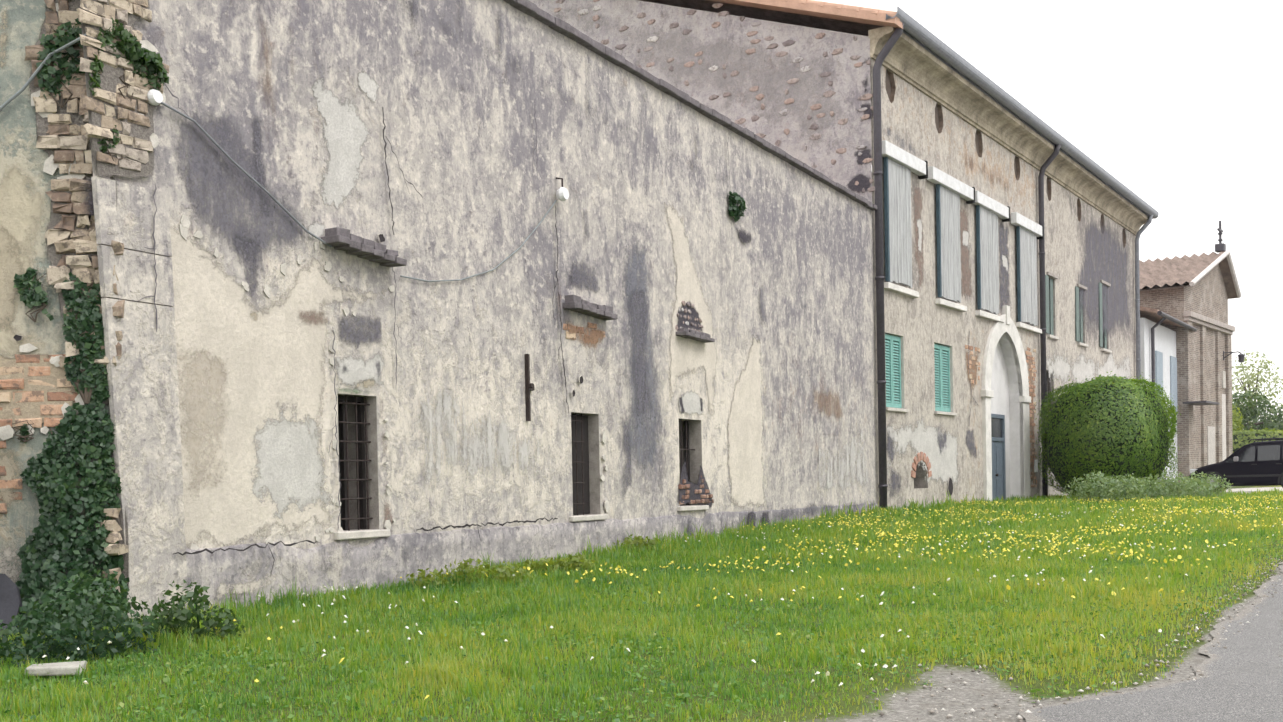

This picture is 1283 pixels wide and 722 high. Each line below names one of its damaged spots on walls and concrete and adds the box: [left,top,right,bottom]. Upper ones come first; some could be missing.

peeling [0,0,396,550]
damp [178,114,304,295]
spalling [563,322,605,346]
damp [624,247,660,486]
peeling [665,204,764,507]